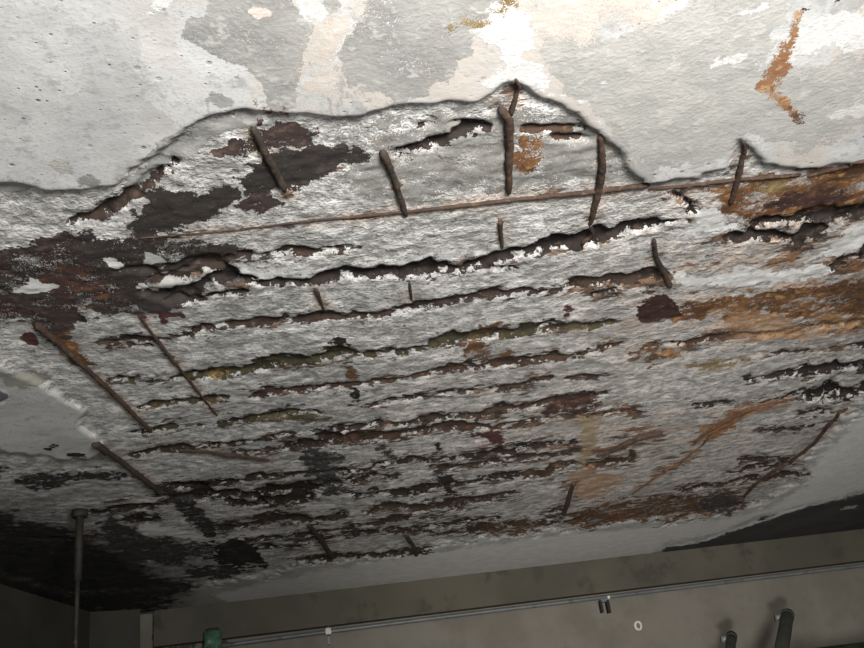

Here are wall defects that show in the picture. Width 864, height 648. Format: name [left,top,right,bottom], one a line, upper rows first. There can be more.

peeling [248,6,272,20]
corrosion [755,6,811,125]
peeling [205,91,234,108]
spalling [0,158,151,295]
corrosion [0,99,373,366]
corrosion [674,164,864,227]
spalling [754,208,814,234]
peeling [129,266,216,288]
corrosion [626,267,864,374]
corrosion [539,391,760,532]
leakage [135,523,284,560]
peeling [661,493,864,552]